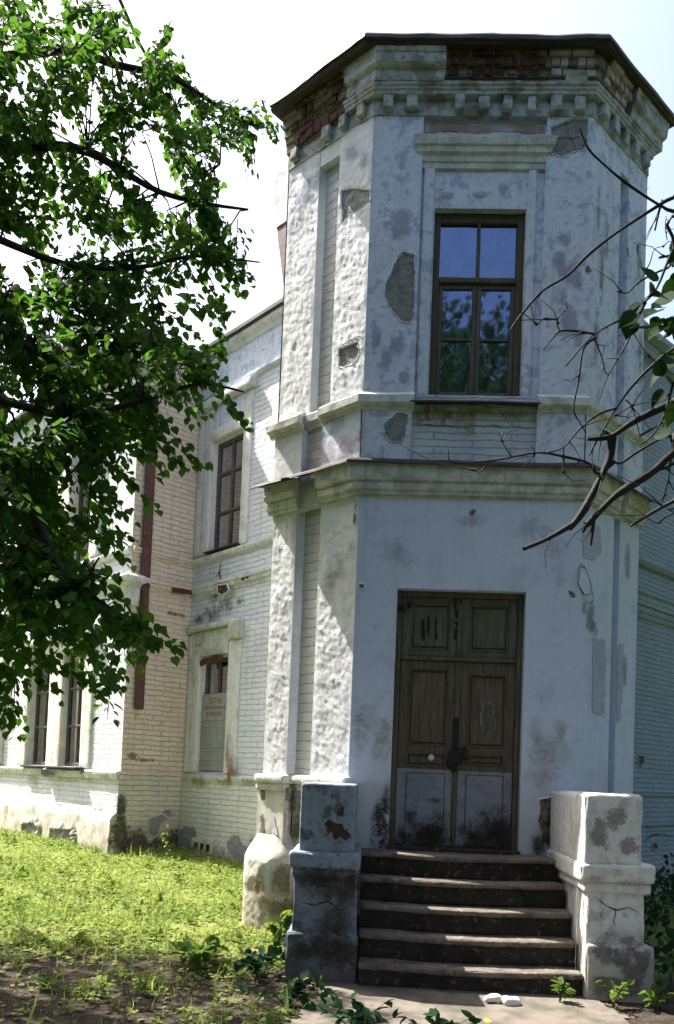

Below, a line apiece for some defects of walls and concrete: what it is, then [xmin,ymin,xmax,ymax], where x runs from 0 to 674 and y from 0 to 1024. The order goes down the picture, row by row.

flaking render [425,116,591,158]
flaking render [340,187,371,224]
flaking render [383,250,418,324]
flaking render [337,340,360,369]
flaking render [381,411,410,444]
flaking render [324,806,350,840]
crack [575,879,638,970]